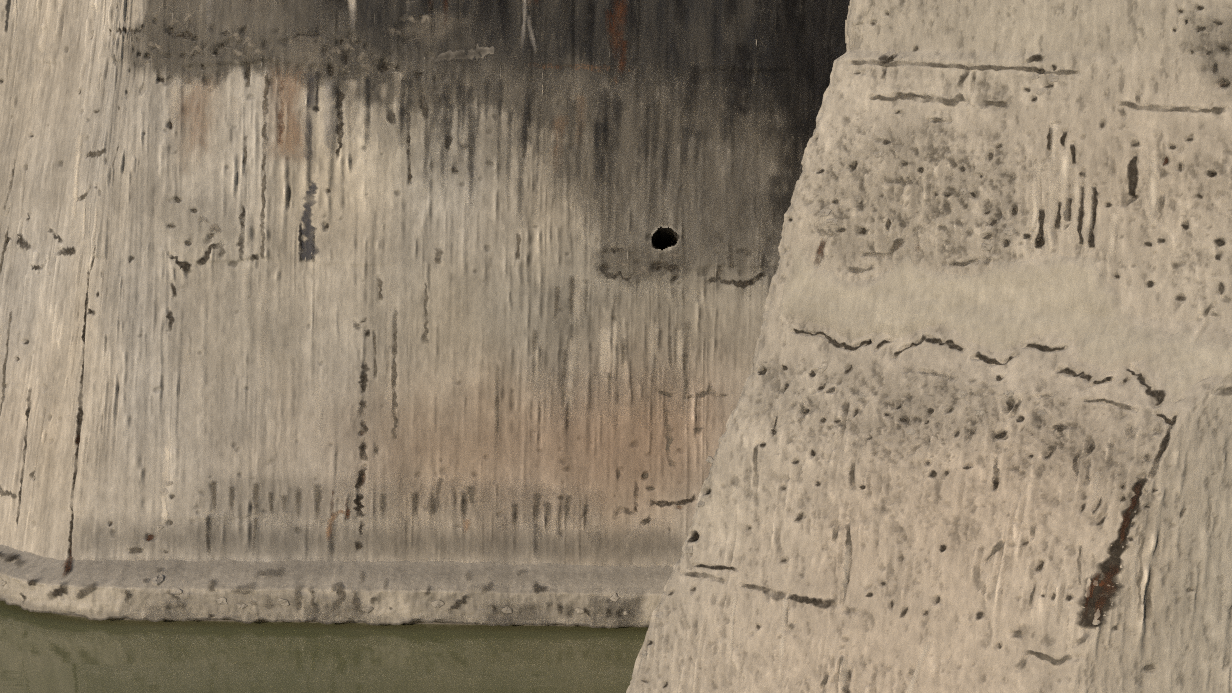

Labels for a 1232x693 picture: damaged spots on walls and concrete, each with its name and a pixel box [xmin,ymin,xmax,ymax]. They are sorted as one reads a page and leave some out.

water stain [144,0,850,268]
crack [794,329,1176,667]